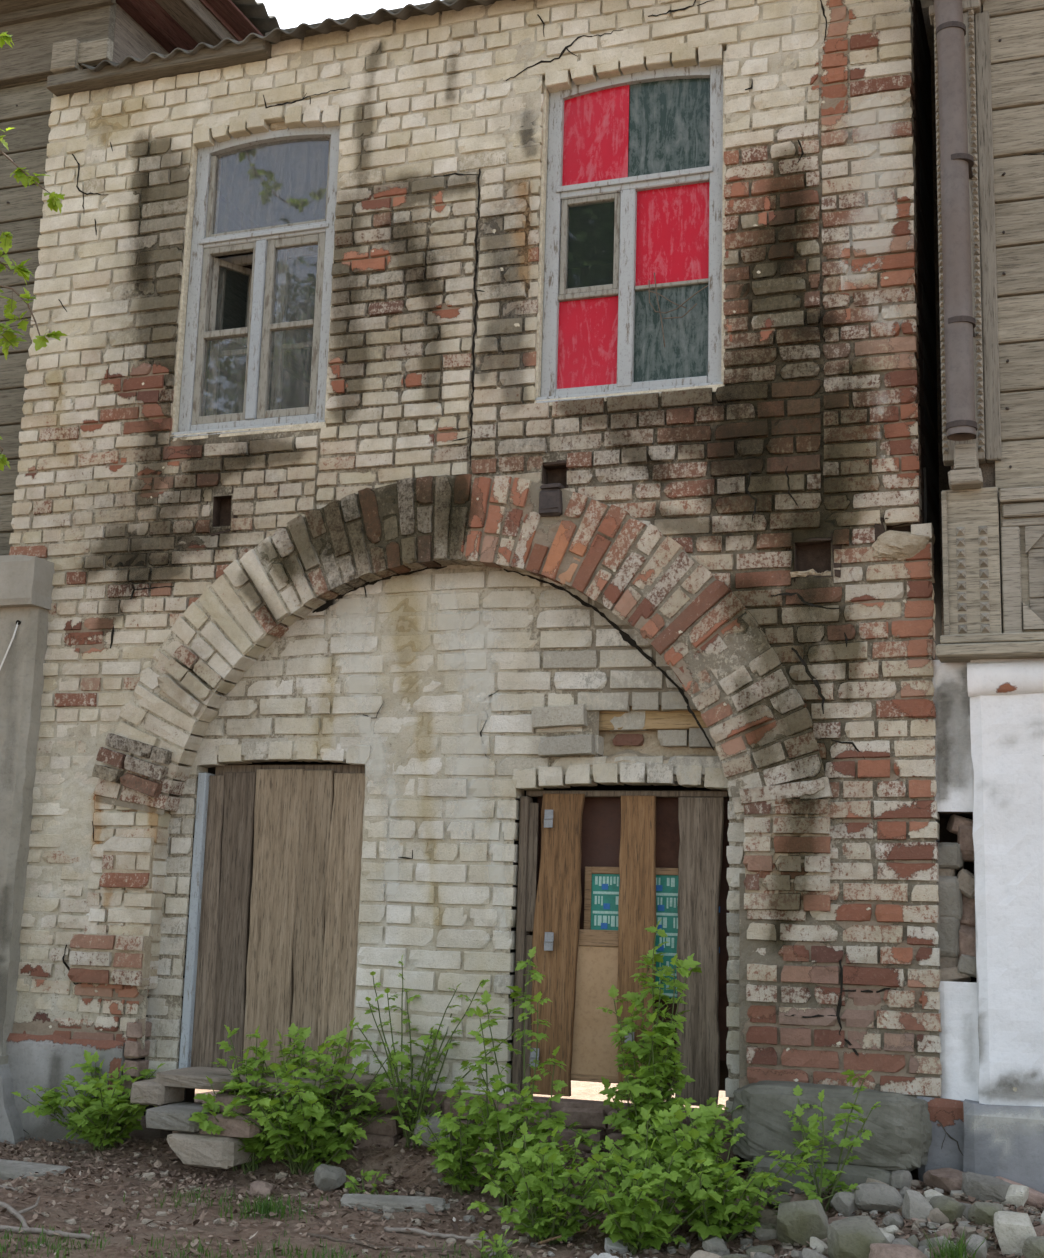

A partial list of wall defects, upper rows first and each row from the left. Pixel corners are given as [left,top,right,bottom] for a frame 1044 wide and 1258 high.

crack [648,0,715,17]
crack [506,15,621,81]
peeling [810,0,880,127]
peeling [100,362,169,425]
peeling [80,419,106,432]
peeling [137,438,194,499]
spalling [64,617,116,656]
peeling [832,748,936,880]
peeling [834,900,904,929]
spalling [20,964,50,988]
spalling [6,983,146,1090]
spalling [739,937,935,1089]